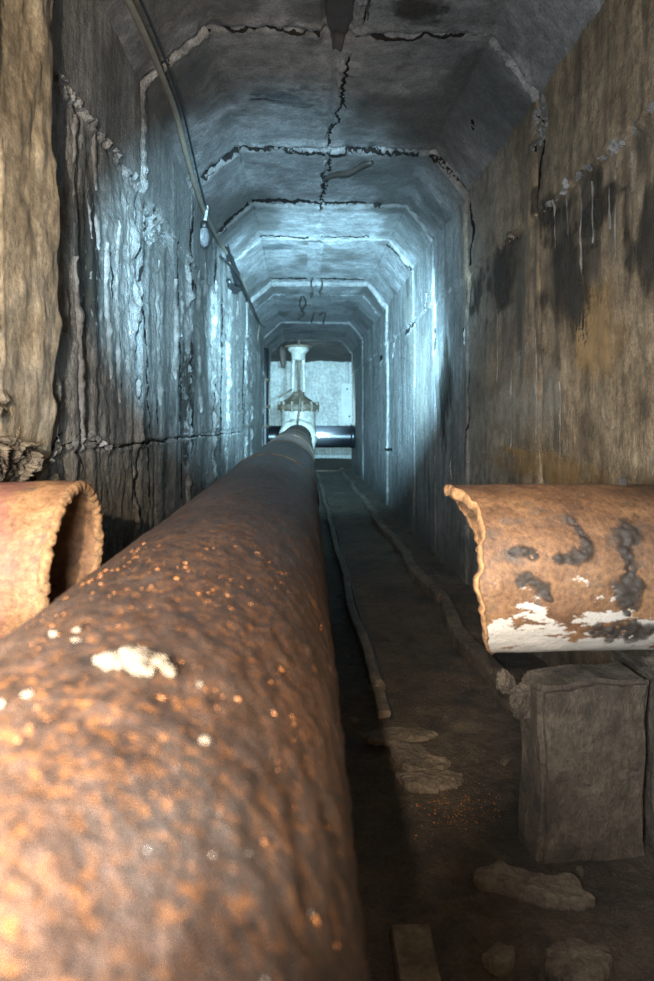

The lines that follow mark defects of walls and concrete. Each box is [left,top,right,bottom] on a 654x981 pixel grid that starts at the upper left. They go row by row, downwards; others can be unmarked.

spalling [53,66,142,189]
spalling [142,206,168,249]
crack [43,0,482,502]
water stain [466,232,517,382]
water stain [531,170,654,343]
spalling [0,390,10,417]
spalling [0,431,113,482]
water stain [498,338,561,468]